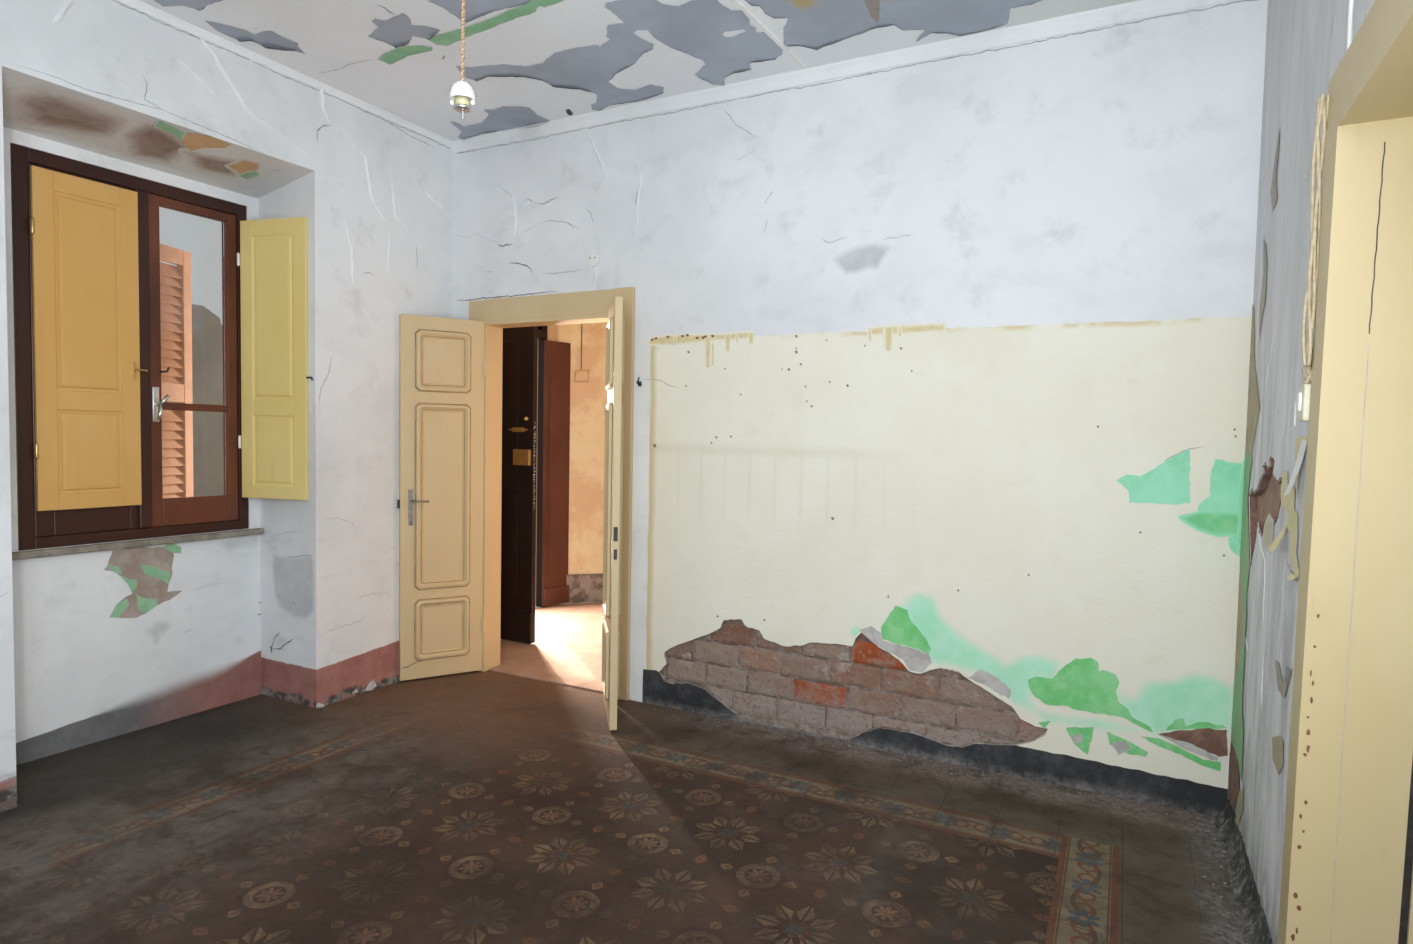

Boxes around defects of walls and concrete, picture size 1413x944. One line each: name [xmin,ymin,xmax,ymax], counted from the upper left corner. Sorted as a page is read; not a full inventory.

water stain [2,83,241,179]
crack [11,63,273,158]
peeling [368,0,564,64]
peeling [450,106,550,140]
crack [113,0,1256,160]
peeling [456,0,1042,111]
peeling [1270,128,1280,222]
peeling [104,544,181,618]
water stain [212,530,316,621]
flaking render [659,234,1308,827]